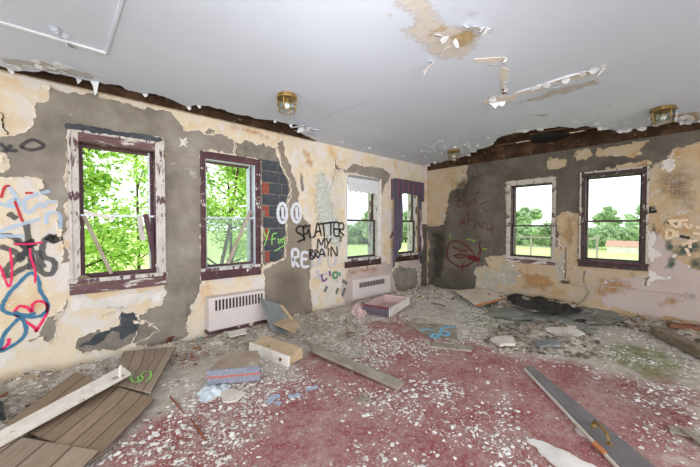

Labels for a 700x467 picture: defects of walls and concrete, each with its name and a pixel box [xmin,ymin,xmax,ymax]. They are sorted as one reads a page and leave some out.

peeling [474,57,606,108]
peeling [289,124,319,140]
spalling [0,60,313,356]
spalling [334,112,700,305]
peeling [600,231,700,322]